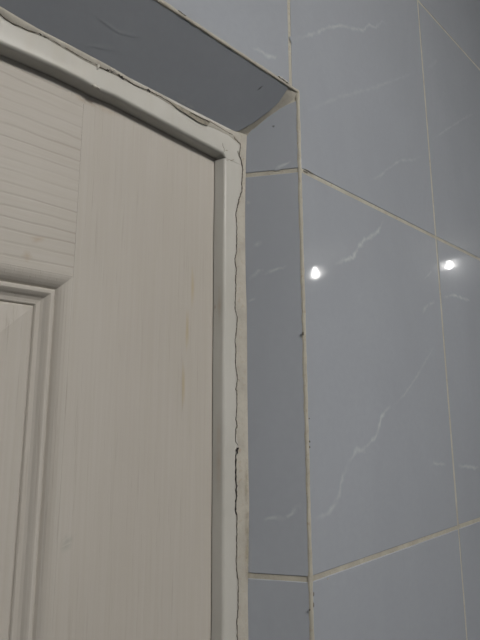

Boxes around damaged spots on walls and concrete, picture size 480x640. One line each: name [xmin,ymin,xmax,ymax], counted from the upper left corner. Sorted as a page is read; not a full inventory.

crack [0,14,172,104]
crack [210,121,243,392]
crack [233,408,241,640]